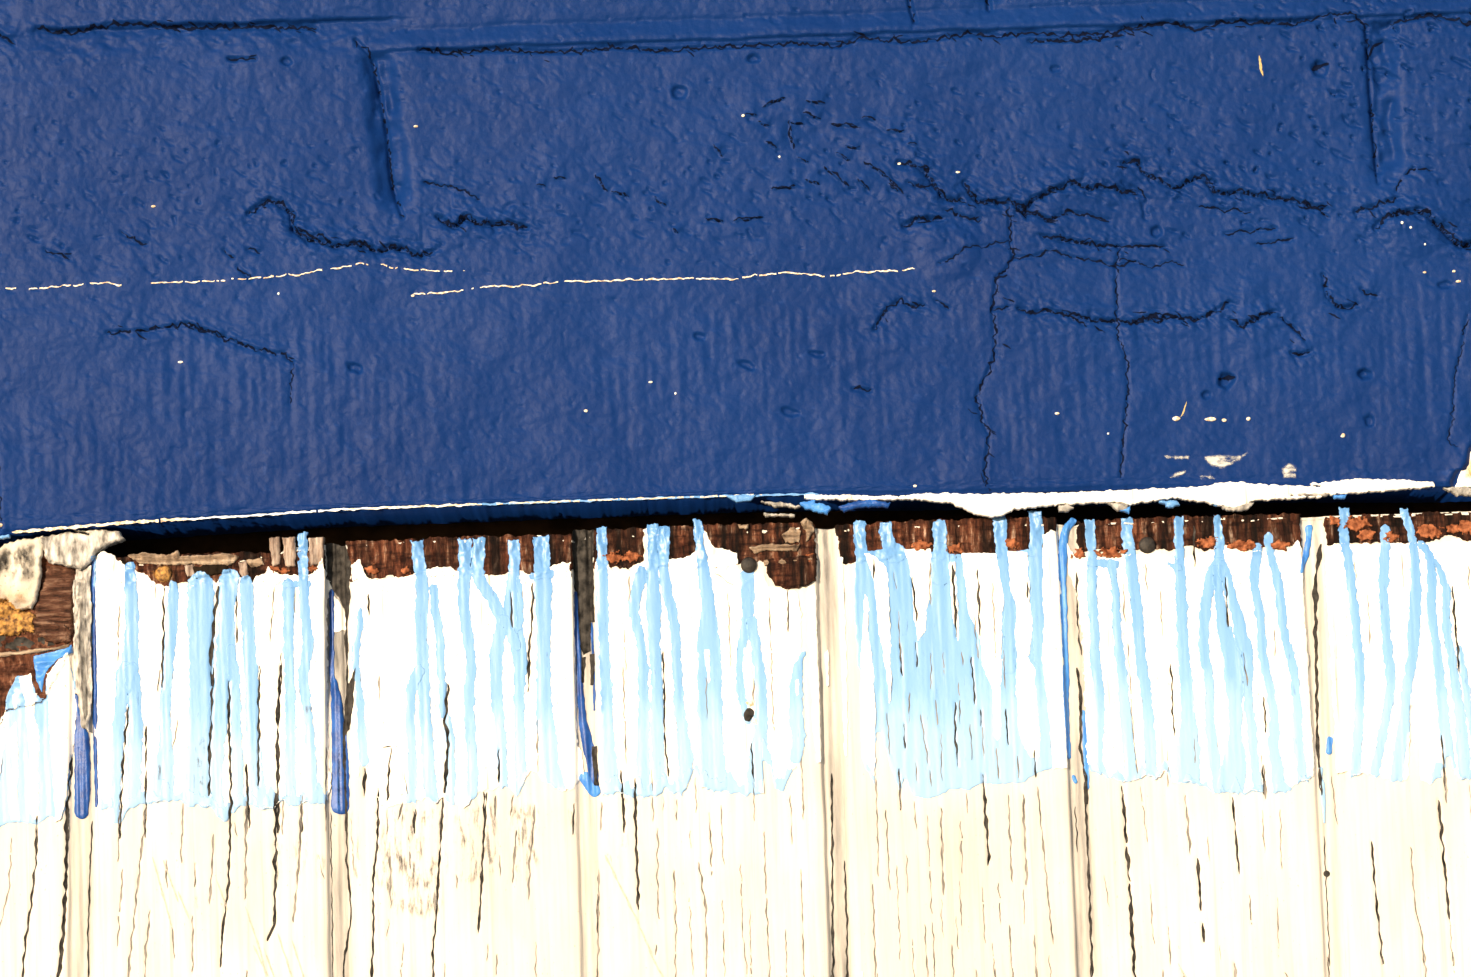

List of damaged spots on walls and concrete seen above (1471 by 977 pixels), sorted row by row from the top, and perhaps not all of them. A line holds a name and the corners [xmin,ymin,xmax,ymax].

crack [0,0,1471,491]
peeling [94,551,190,811]
crack [0,543,539,977]
peeling [207,558,584,817]
spalling [0,478,1435,540]
peeling [595,528,892,797]
crack [572,526,1288,977]
peeling [904,530,1315,794]
crack [1312,544,1371,975]
peeling [1324,515,1471,785]
crack [1371,735,1471,977]
crack [1452,566,1470,672]